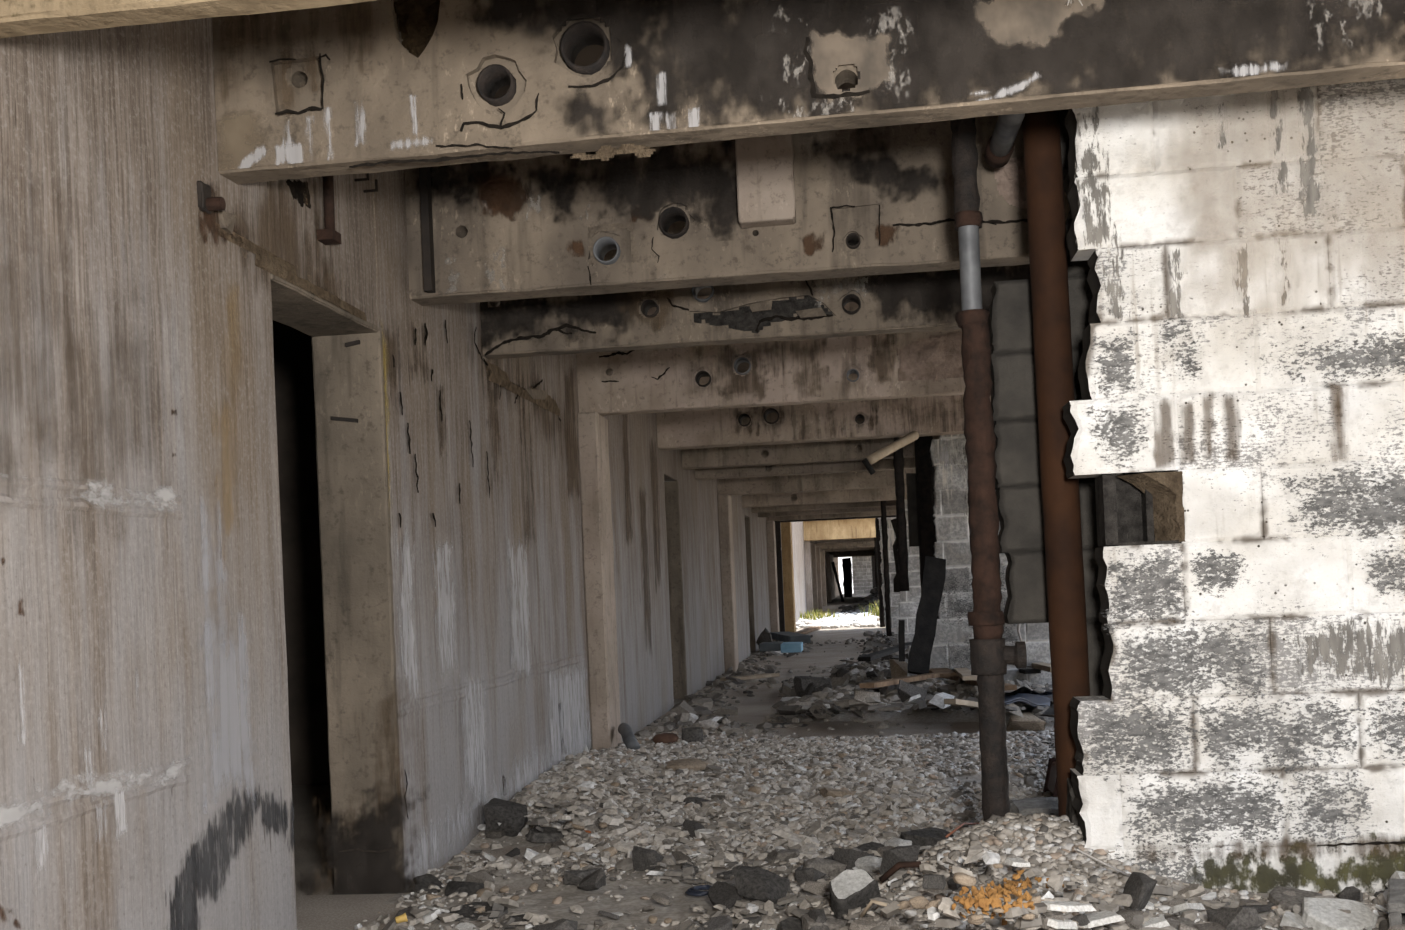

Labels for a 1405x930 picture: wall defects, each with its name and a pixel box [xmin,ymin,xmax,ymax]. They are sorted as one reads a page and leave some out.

crack [349,53,627,168]
peeling [694,295,832,333]
peeling [1075,107,1203,468]
crack [474,323,670,421]
peeling [1281,464,1405,598]
peeling [1083,548,1405,883]
water stain [1262,843,1315,857]